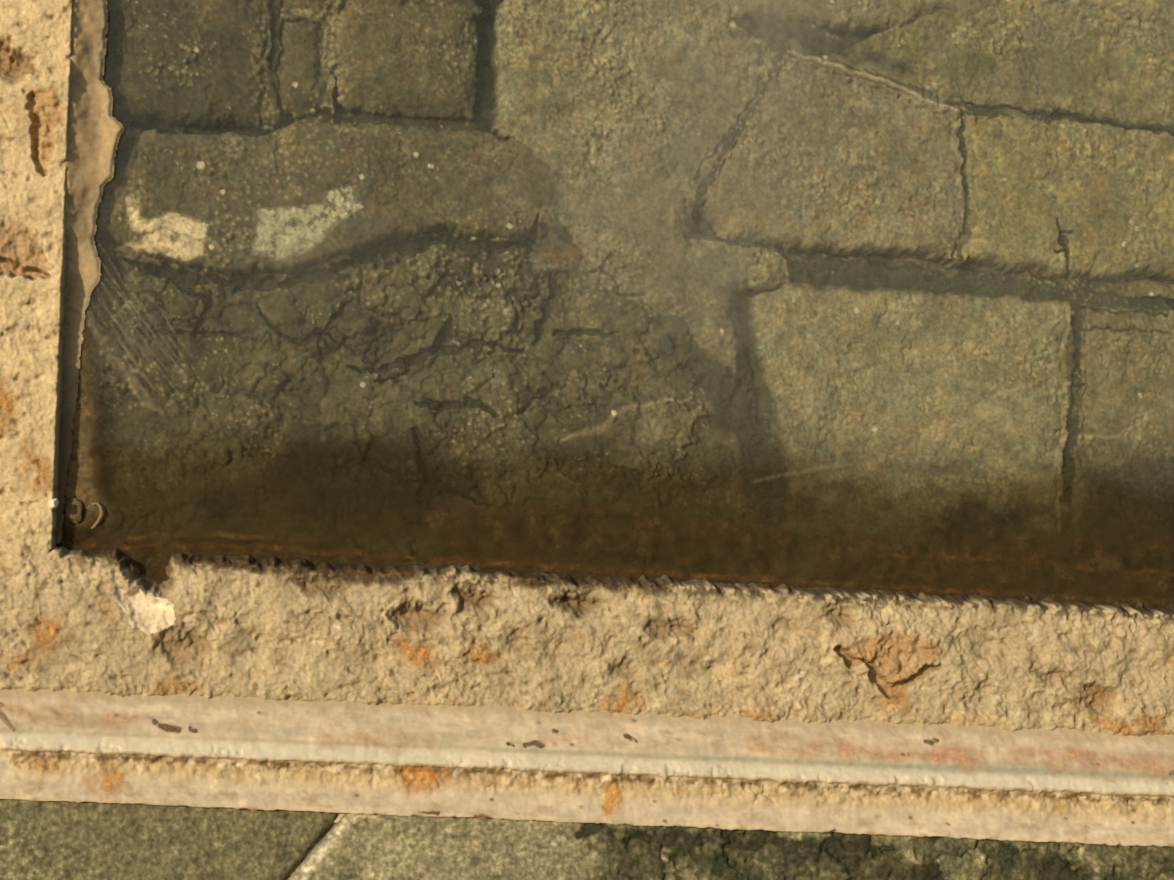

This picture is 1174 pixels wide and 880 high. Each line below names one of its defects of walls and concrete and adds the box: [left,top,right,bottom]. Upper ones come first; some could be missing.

spalling [0,32,67,177]
spalling [0,217,53,281]
water stain [125,197,208,240]
water stain [253,186,363,259]
spalling [381,577,538,656]
spalling [547,586,608,622]
spalling [631,610,707,648]
spalling [812,598,946,701]